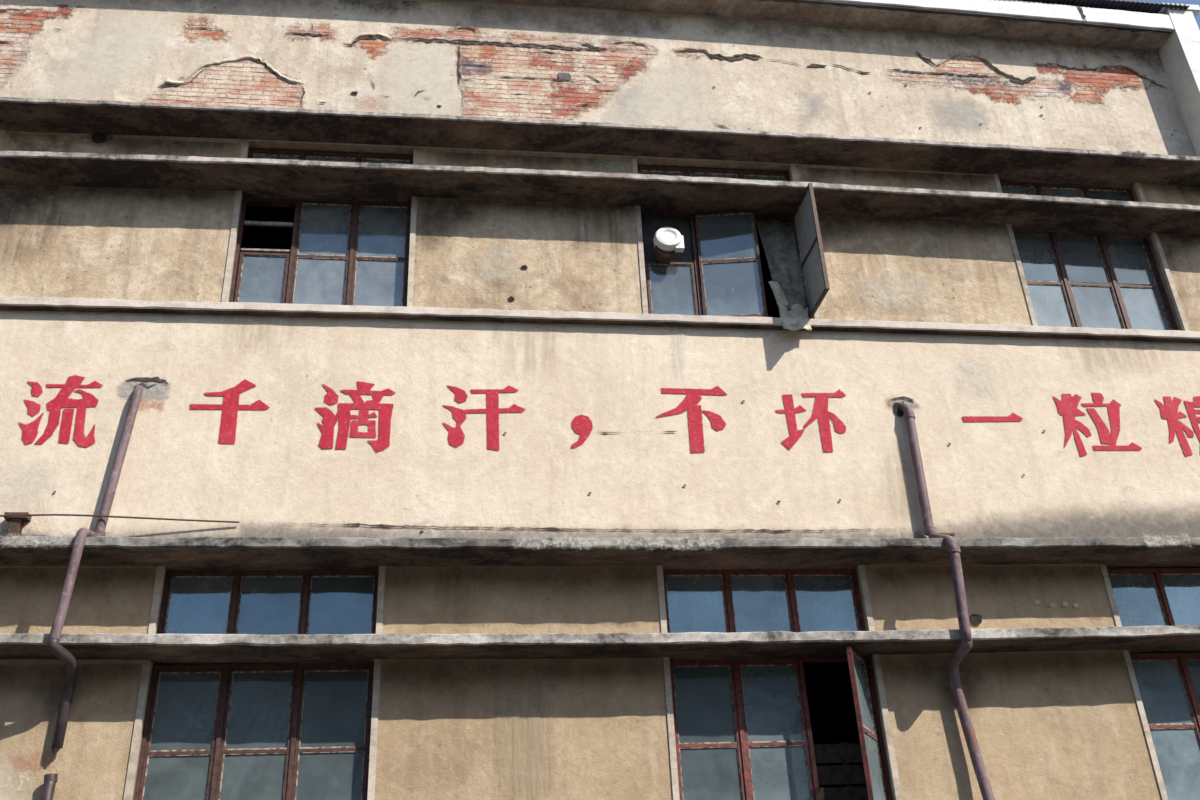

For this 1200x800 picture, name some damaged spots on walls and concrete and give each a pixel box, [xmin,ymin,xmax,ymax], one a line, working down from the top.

flaking render [0,4,83,90]
flaking render [180,16,231,42]
flaking render [141,54,306,109]
flaking render [285,23,658,121]
crack [672,46,871,74]
flaking render [888,51,1167,116]
peeling [0,754,50,800]